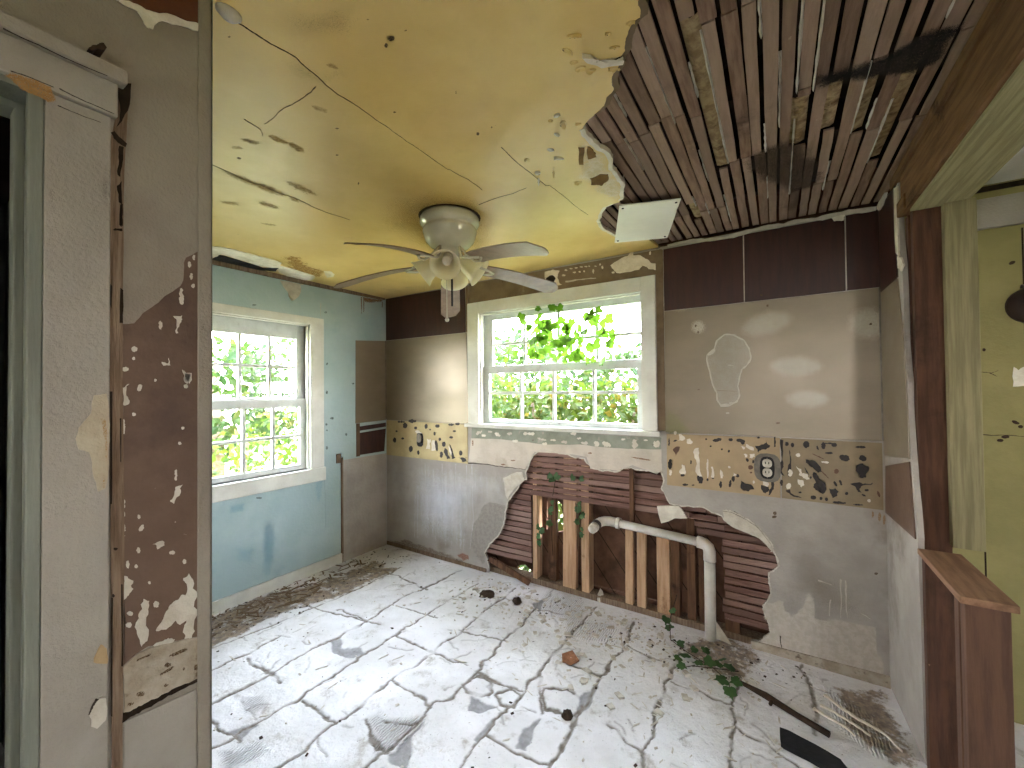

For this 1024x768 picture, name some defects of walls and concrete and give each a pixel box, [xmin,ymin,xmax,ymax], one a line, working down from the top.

leakage [815,22,965,89]
crack [239,23,588,215]
spalling [469,0,990,303]
leakage [744,138,830,193]
peeling [159,255,195,333]
peeling [212,246,335,301]
peeling [123,384,142,434]
peeling [170,469,182,503]
spalling [468,427,884,674]
peeling [124,541,197,647]